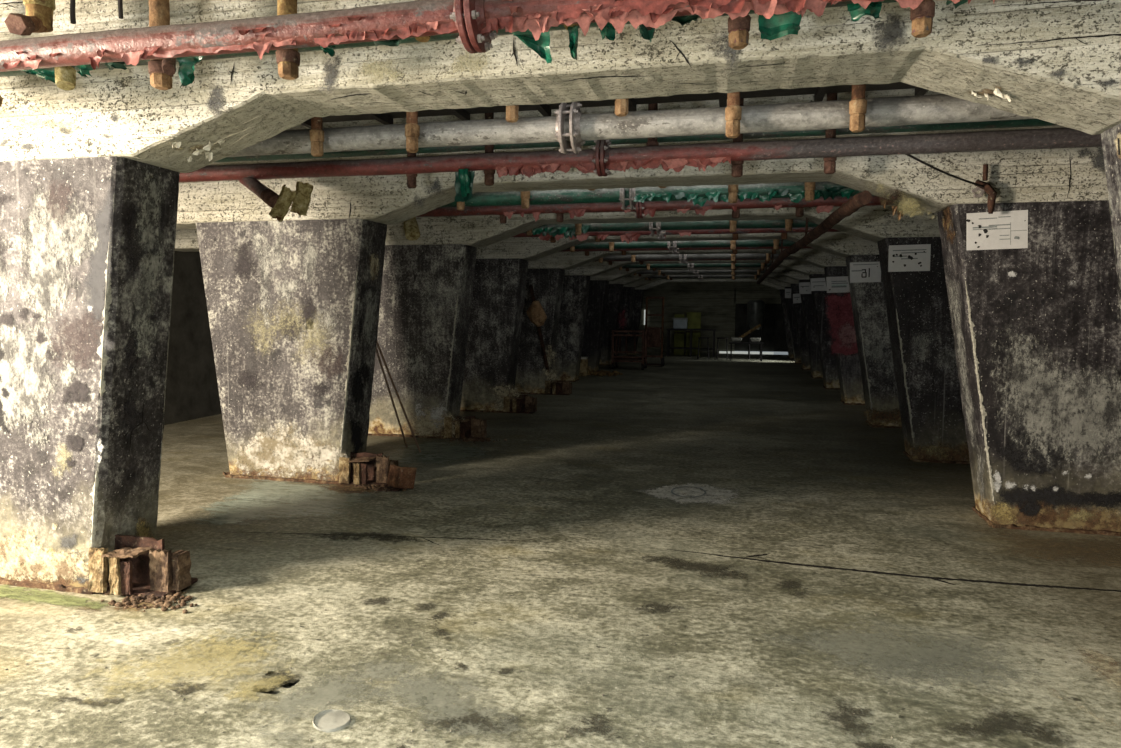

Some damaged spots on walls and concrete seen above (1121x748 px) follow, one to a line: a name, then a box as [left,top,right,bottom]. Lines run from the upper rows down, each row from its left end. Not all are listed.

peeling [324,16,389,40]
peeling [408,21,438,34]
peeling [480,6,568,33]
peeling [649,7,674,23]
peeling [719,0,842,19]
peeling [238,27,293,59]
peeling [494,162,607,178]
peeling [633,157,726,172]
leakage [236,423,345,480]
corrosion [984,502,1121,532]